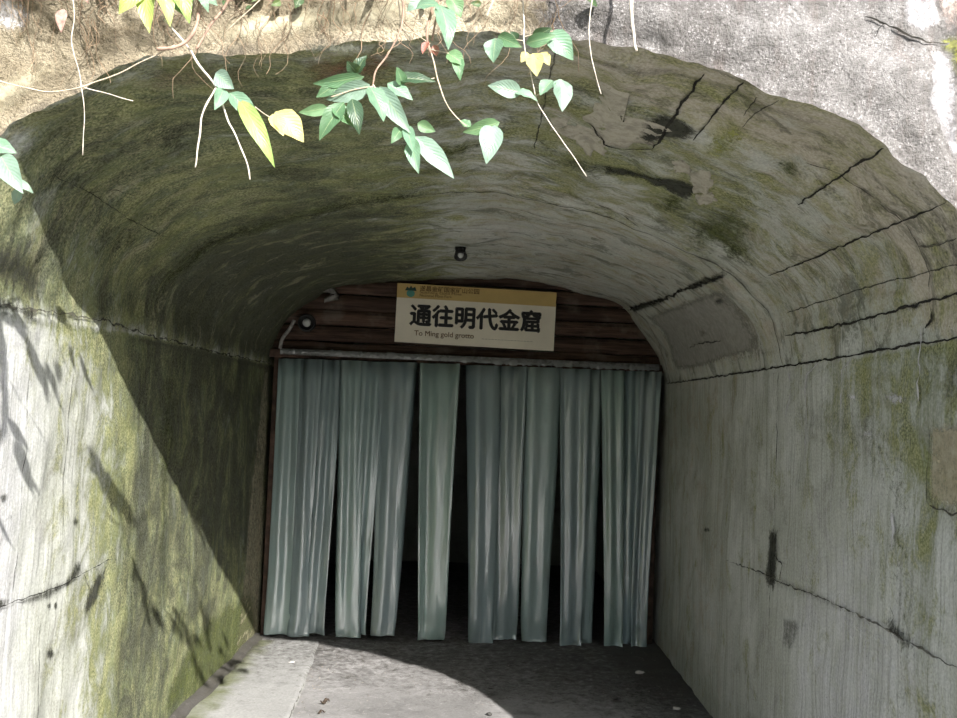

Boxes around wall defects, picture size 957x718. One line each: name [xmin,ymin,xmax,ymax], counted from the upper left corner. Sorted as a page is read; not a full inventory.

crack [865,16,947,44]
peeling [550,80,718,206]
crack [807,163,956,328]
crack [630,275,723,312]
crack [727,443,956,667]
water stain [23,563,80,608]
crack [0,559,111,607]
water stain [85,570,105,610]